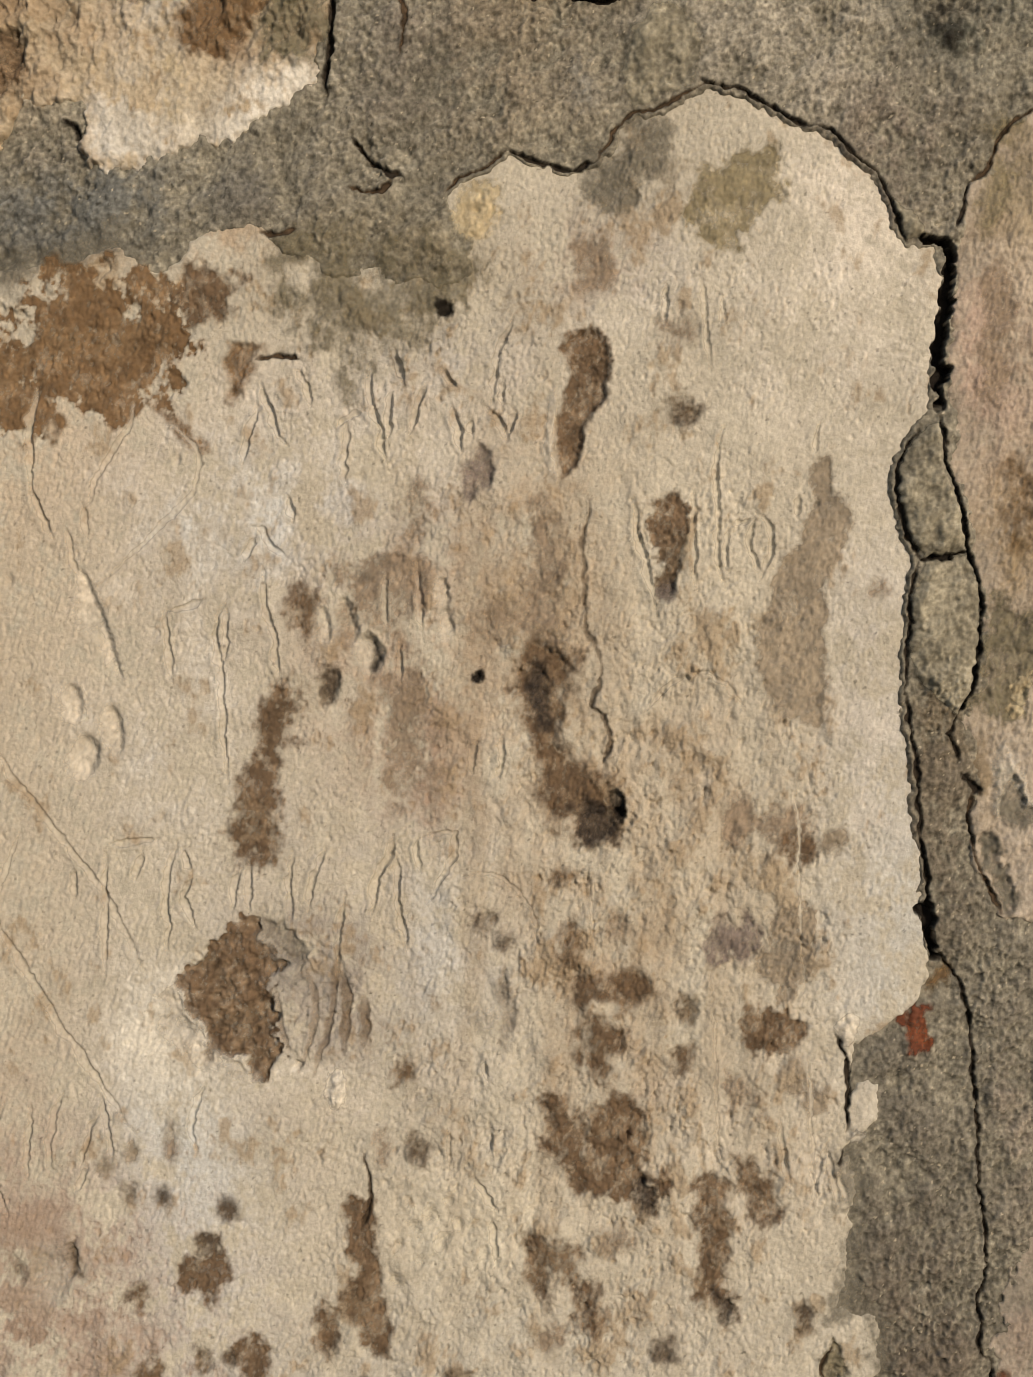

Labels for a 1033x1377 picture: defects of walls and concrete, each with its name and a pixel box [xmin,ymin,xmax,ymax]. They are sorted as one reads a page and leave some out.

spalling [63,118,82,141]
crack [351,138,403,194]
spalling [435,297,454,317]
spalling [224,343,298,396]
water stain [335,479,437,636]
water stain [281,581,321,636]
water stain [475,493,627,847]
crack [447,79,1033,1377]
water stain [228,684,308,868]
spalling [159,912,306,1083]
rust [896,1004,934,1056]
crack [362,1158,373,1225]